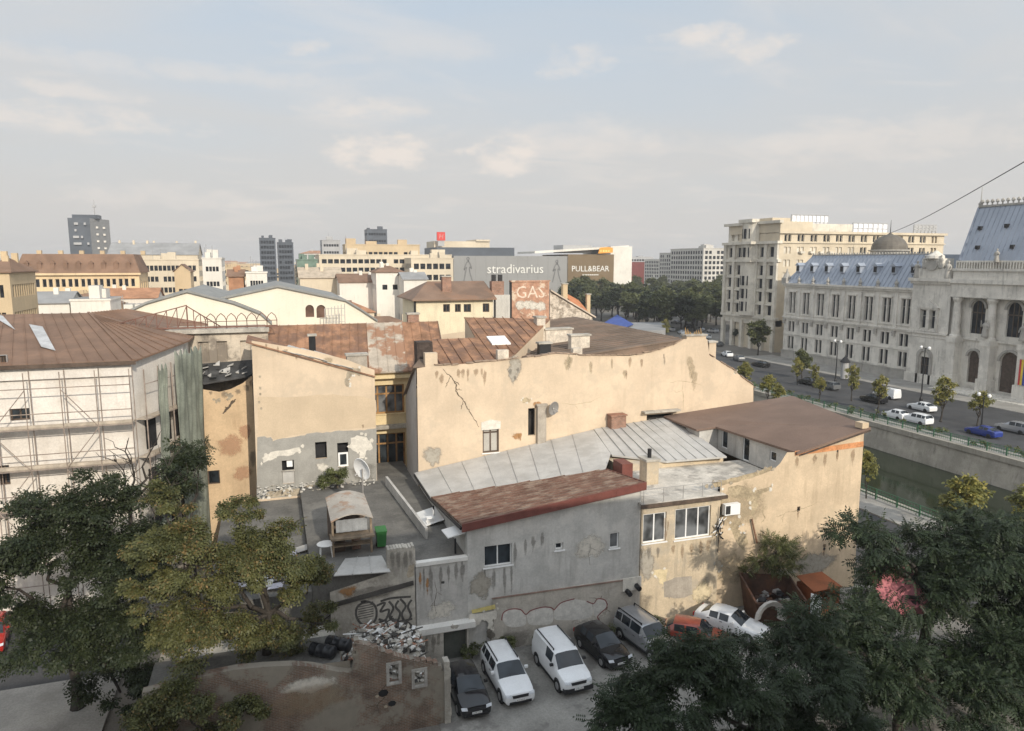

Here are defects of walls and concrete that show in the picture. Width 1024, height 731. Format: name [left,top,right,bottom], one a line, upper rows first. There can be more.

crack [443,369,479,427]
spalling [235,444,304,479]
spalling [347,432,374,460]